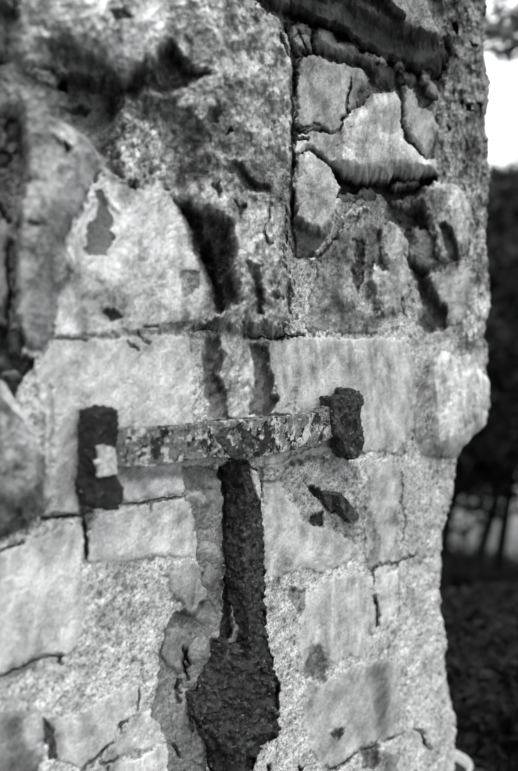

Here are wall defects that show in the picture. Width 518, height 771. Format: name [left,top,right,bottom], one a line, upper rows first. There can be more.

corrosion [185,689,220,751]
corrosion [248,743,264,769]
crack [326,729,429,771]